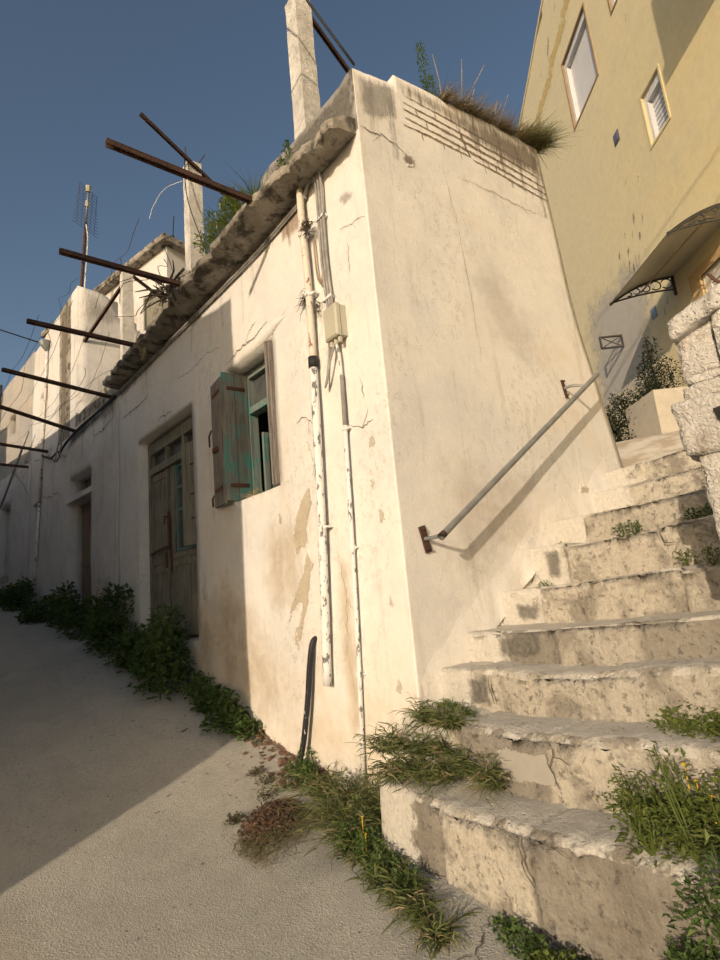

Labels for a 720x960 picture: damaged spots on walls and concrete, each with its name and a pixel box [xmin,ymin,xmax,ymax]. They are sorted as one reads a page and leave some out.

peeling [289,489,313,650]
crack [458,915,491,960]